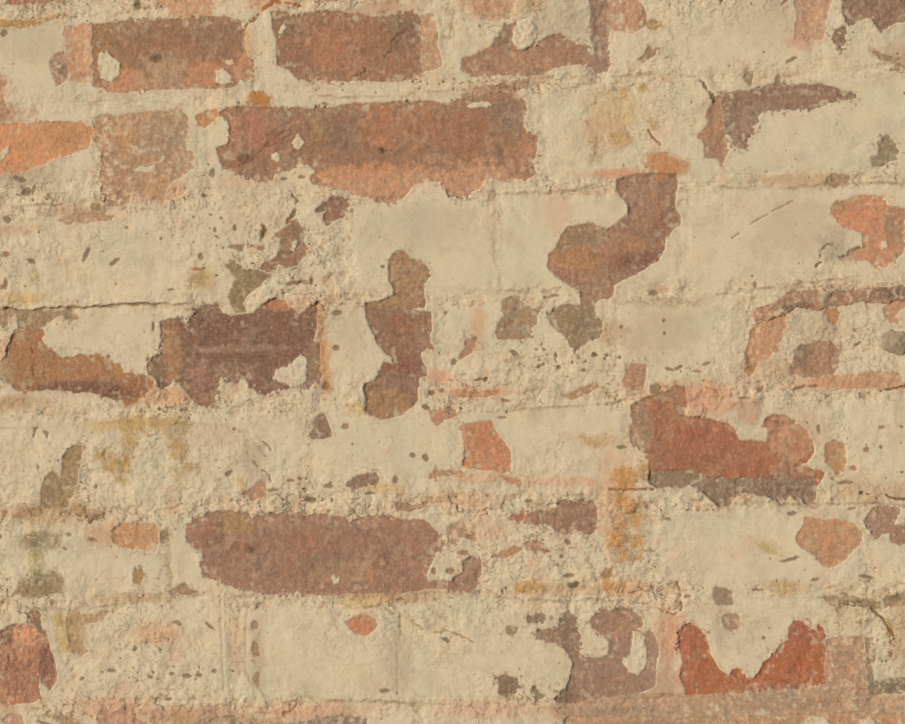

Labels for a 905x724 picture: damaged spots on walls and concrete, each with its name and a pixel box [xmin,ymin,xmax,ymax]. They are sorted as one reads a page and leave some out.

peeling [50,16,255,93]
peeling [272,11,442,83]
peeling [461,0,662,78]
peeling [0,92,538,226]
peeling [698,71,856,165]
peeling [496,174,681,352]
peeling [0,219,322,408]
peeling [364,251,434,419]
spalling [623,363,847,507]
peeling [186,498,482,596]
peeling [527,608,659,705]
peeling [678,621,905,696]